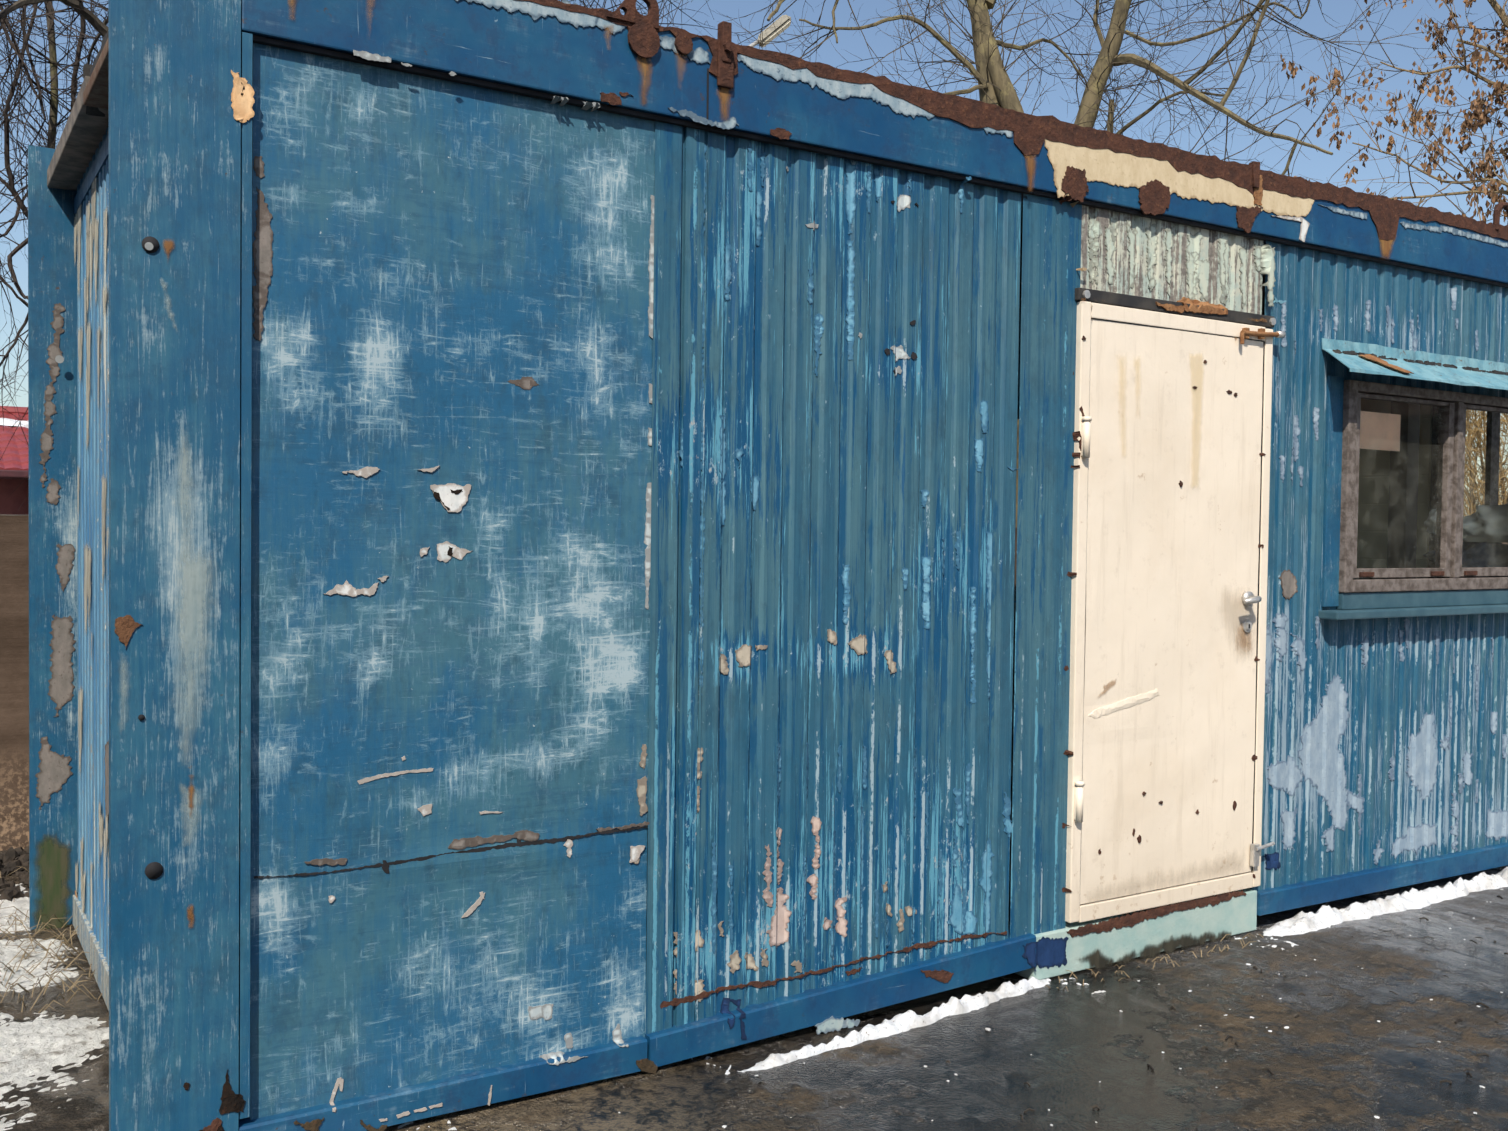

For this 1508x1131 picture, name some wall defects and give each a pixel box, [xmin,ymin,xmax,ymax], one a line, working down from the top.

corrosion [519,0,634,32]
spalling [231,70,255,123]
corrosion [600,57,650,106]
corrosion [656,26,1508,257]
peeling [39,177,109,522]
spalling [418,466,471,513]
peeling [1267,675,1365,852]
peeling [1373,695,1508,865]
leakage [34,836,71,930]
peeling [673,746,917,995]
corrosion [1066,852,1281,937]
corrosion [660,931,1007,1009]